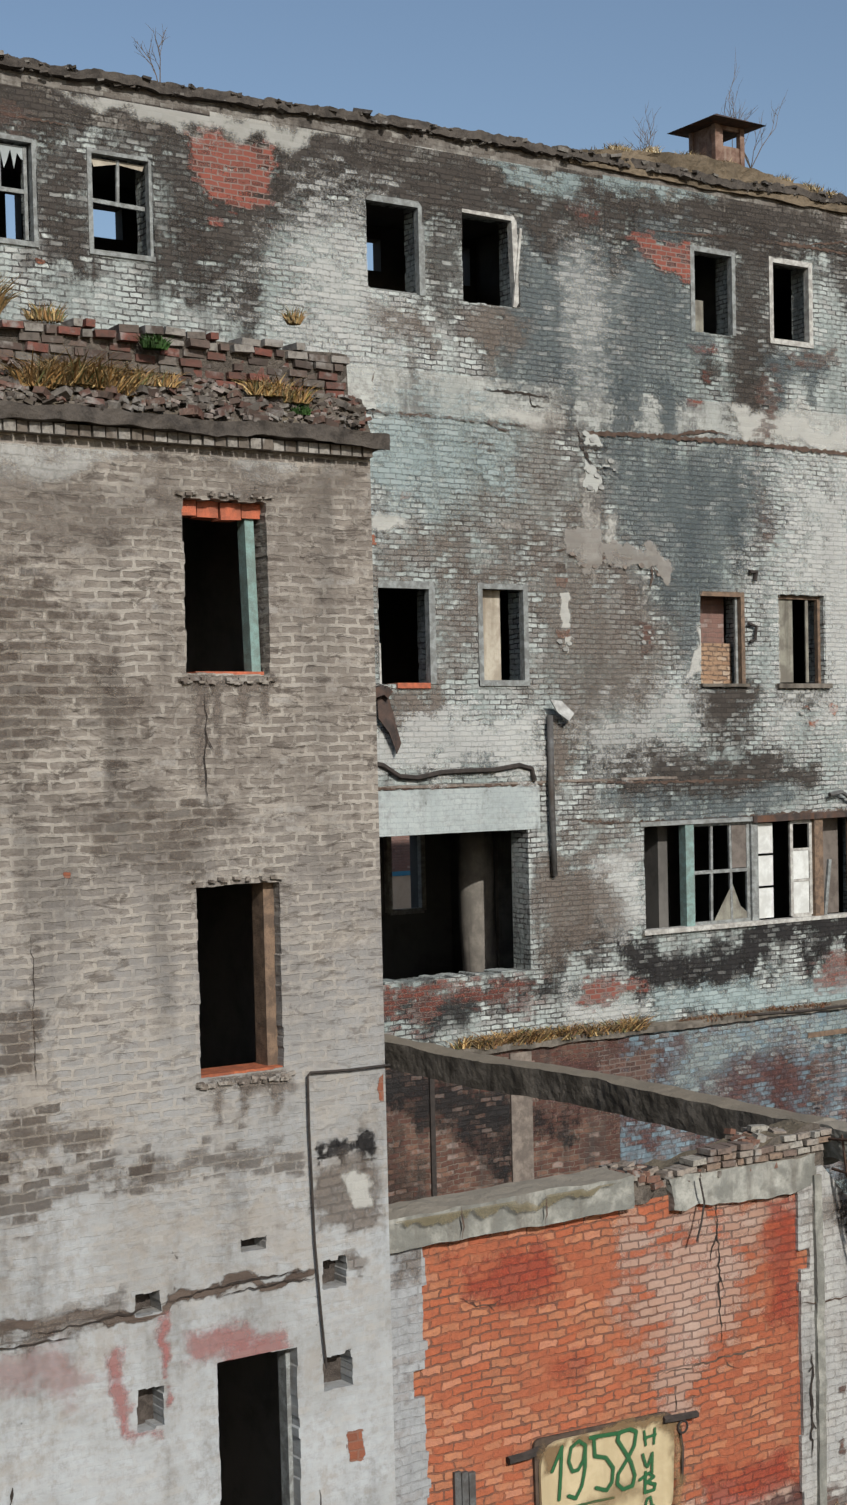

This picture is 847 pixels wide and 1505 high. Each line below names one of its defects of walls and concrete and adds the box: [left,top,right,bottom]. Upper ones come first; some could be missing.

spalling [184,126,278,227]
water stain [367,300,436,355]
water stain [459,304,525,371]
water stain [739,349,829,416]
water stain [653,380,683,454]
peeling [582,430,620,492]
peeling [557,527,672,586]
crack [204,696,214,805]
water stain [799,943,821,988]
spalling [593,1036,661,1083]
water stain [833,1163,847,1233]
crack [653,1204,817,1454]